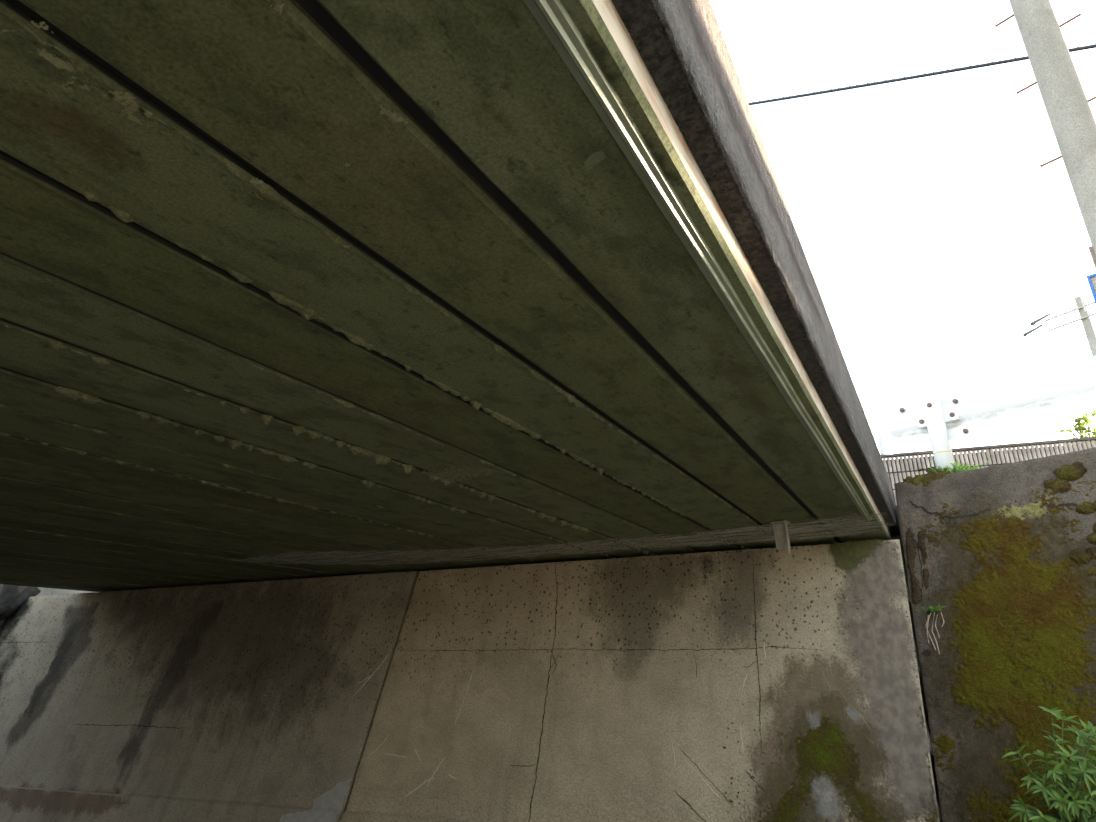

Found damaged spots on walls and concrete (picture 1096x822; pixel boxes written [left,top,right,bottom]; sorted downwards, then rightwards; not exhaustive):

peeling [30,20,181,137]
water stain [228,524,775,566]
water stain [8,604,98,744]
crack [408,565,824,821]
water stain [740,513,937,822]